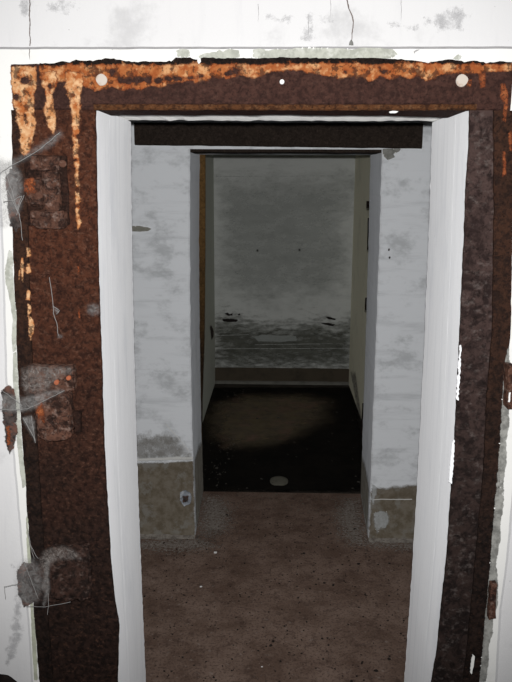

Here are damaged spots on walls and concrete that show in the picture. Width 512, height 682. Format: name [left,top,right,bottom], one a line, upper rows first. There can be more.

rust [10,57,512,229]
rust [18,248,32,281]
rust [25,289,35,341]
peeling [1,250,26,488]
water stain [215,318,351,369]